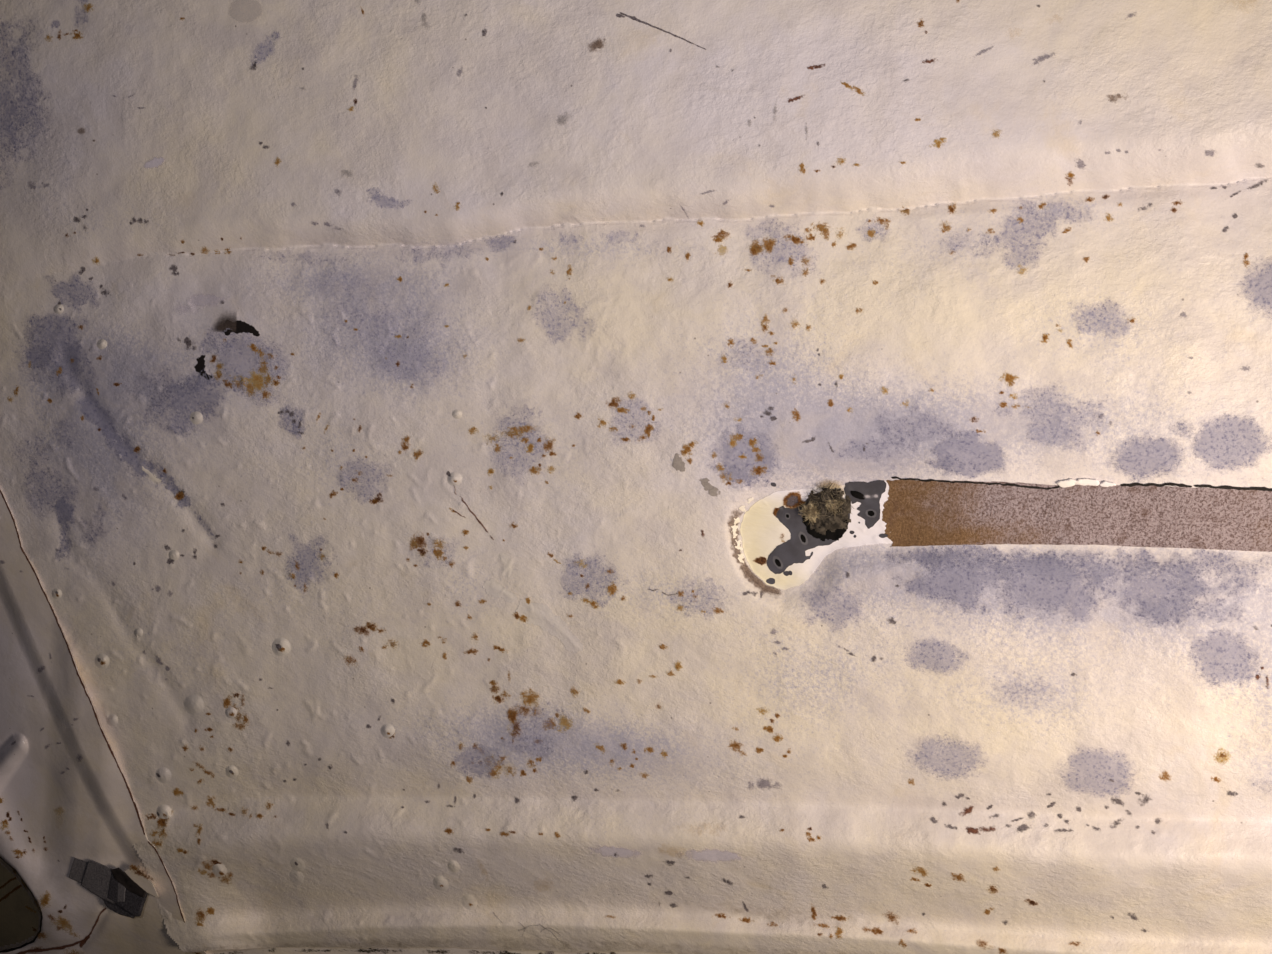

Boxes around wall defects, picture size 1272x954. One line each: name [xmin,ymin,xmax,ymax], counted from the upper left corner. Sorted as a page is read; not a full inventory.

corrosion [750,223,857,275]
peeling [26,267,190,507]
peeling [140,328,304,436]
corrosion [211,344,281,398]
peeling [672,454,685,472]
peeling [829,415,1006,478]
peeling [1023,386,1111,445]
peeling [19,441,104,561]
corrosion [882,479,1272,552]
peeling [700,427,1269,689]
corrosion [450,674,572,783]